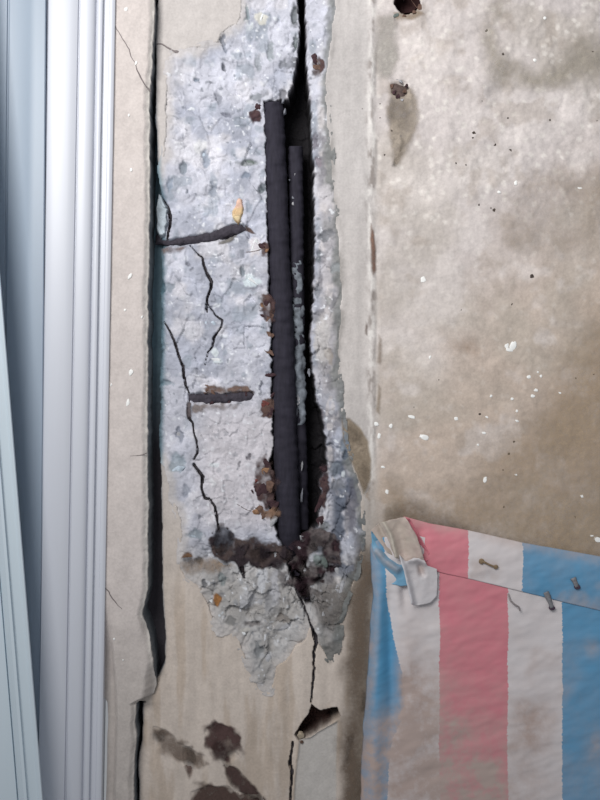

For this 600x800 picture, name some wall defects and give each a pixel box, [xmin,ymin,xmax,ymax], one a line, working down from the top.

crack [115,26,151,91]
corrosion [311,53,325,75]
damp [387,89,417,165]
spalling [156,0,370,697]
crack [134,123,223,669]
corrosion [187,385,253,417]
corrosion [182,458,346,624]
crack [295,589,318,702]
spalling [297,704,331,744]
crack [287,741,295,800]